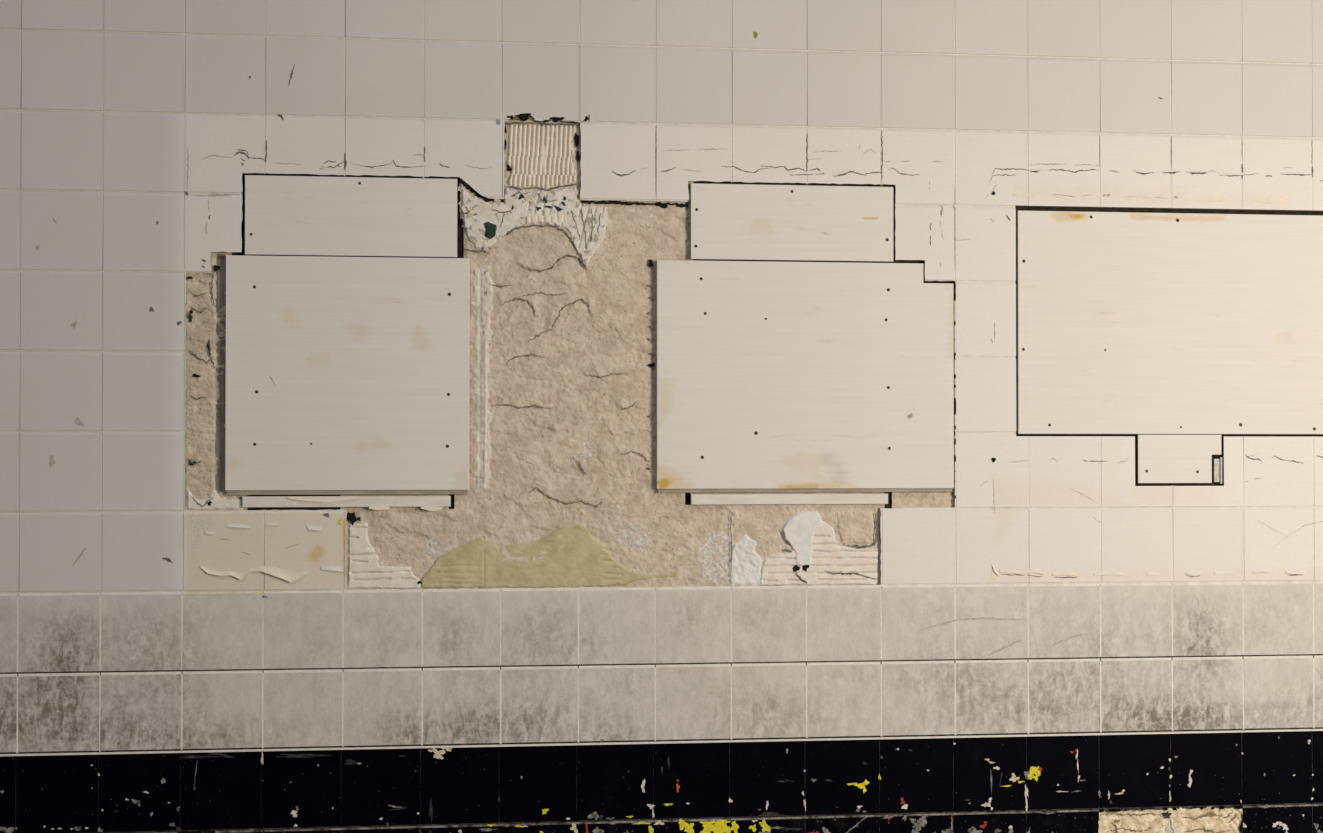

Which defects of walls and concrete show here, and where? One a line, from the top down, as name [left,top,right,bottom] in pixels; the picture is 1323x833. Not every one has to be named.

crack [613,126,1323,266]
spalling [200,113,955,589]
spalling [177,252,250,551]
peeling [379,799,433,833]
peeling [587,812,628,833]
peeling [758,801,802,833]
peeling [882,766,1030,833]
spalling [1098,756,1243,833]